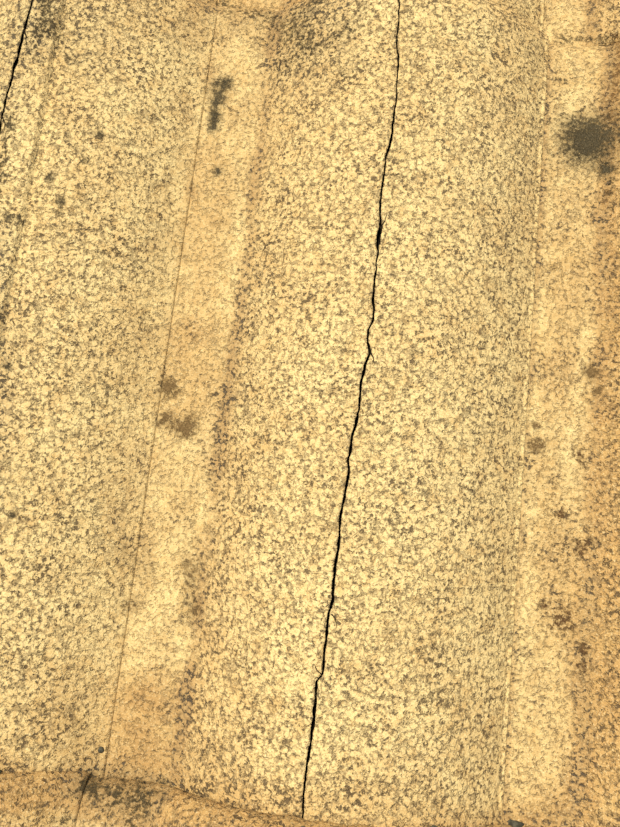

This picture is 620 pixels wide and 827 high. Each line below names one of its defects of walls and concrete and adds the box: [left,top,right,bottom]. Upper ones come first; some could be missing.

crack [0,0,33,133]
water stain [209,79,230,130]
water stain [560,115,620,196]
crack [302,0,400,819]